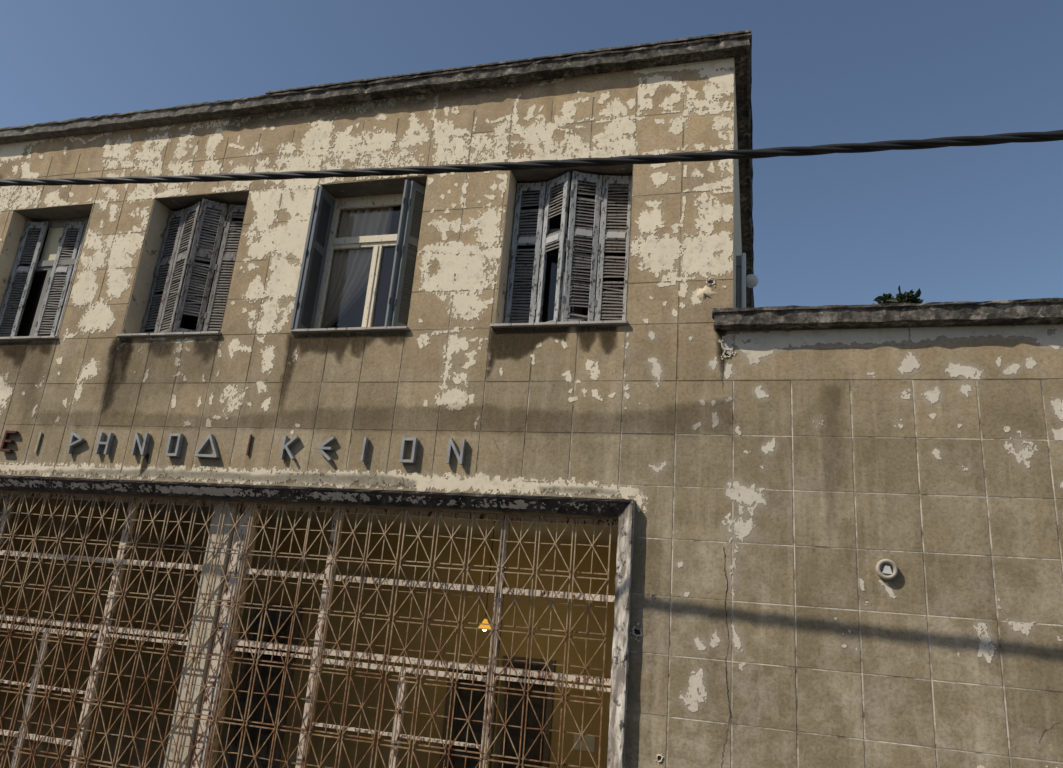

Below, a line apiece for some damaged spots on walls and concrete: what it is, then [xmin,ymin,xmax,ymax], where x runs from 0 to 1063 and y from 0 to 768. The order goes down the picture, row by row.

peeling [0,58,734,431]
leakage [104,339,132,409]
peeling [709,325,1063,379]
peeling [945,362,984,397]
peeling [901,386,941,420]
peeling [744,438,775,469]
peeling [1003,426,1039,468]
peeling [0,460,648,513]
peeling [722,481,768,597]
peeling [998,598,1035,636]
peeling [974,623,996,663]
peeling [679,668,707,712]